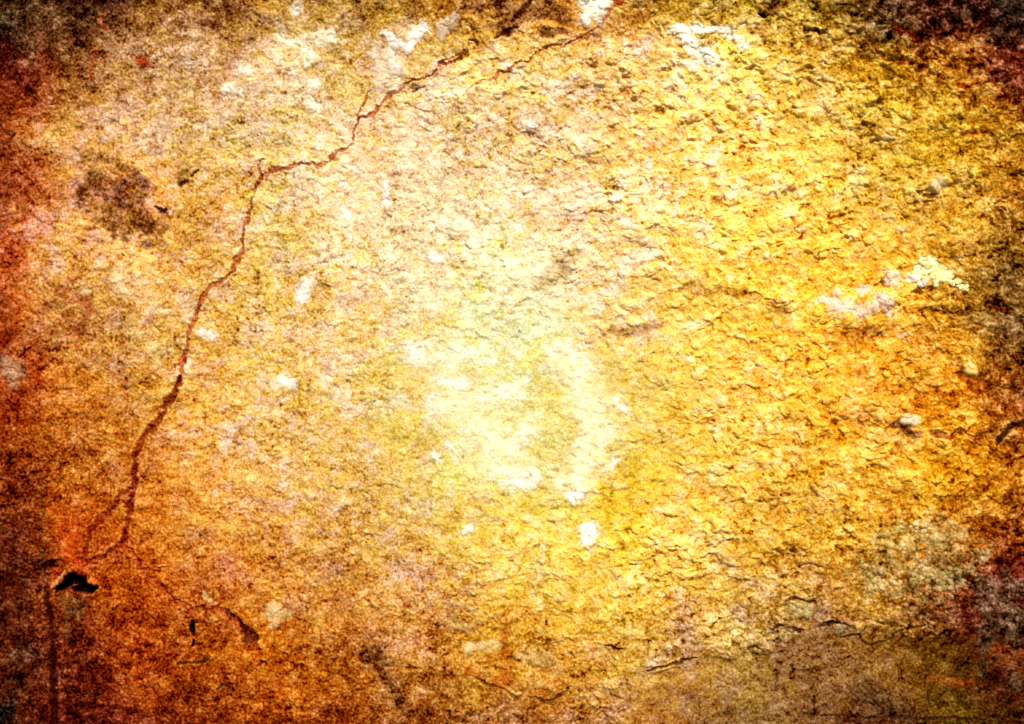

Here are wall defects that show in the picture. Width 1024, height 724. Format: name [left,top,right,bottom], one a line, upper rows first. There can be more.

crack [466,0,622,92]
crack [38,50,466,724]
crack [477,678,569,704]